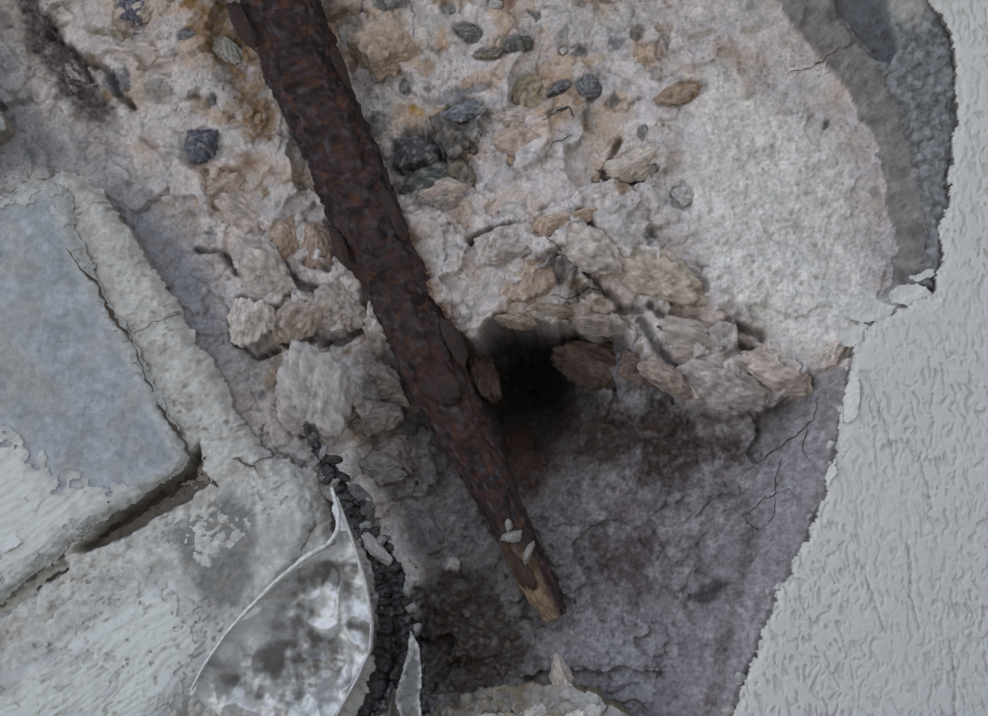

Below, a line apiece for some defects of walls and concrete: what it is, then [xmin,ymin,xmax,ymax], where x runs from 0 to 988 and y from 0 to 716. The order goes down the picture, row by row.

flaking render [833,0,958,274]
crack [66,248,218,538]
spalling [230,234,297,311]
spalling [275,339,360,446]
corrosion [189,0,566,623]
spalling [557,223,625,275]
spalling [616,246,704,308]
spalling [658,315,726,366]
spalling [676,354,779,415]
peeling [0,325,186,601]
crack [743,397,818,531]
crack [37,567,70,591]